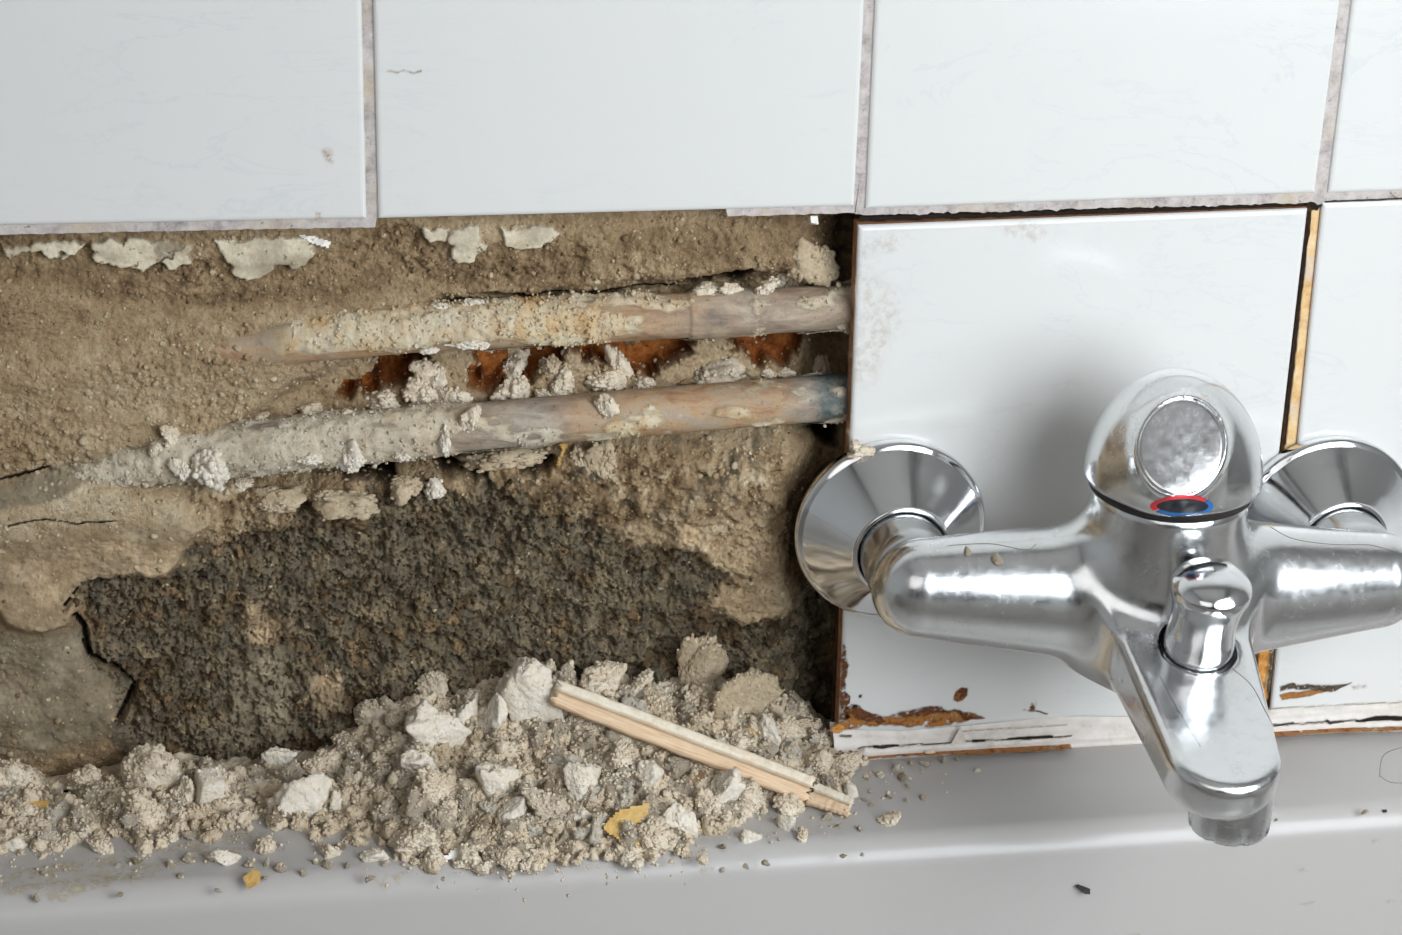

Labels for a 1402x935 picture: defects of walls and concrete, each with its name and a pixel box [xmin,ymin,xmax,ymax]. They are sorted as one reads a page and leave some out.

corrosion [337,353,428,396]
corrosion [467,338,690,390]
corrosion [730,332,801,365]
spalling [0,209,858,752]
water stain [697,452,739,486]
water stain [0,465,833,761]
crack [63,585,136,721]
spalling [0,588,235,794]
corrosion [1255,649,1350,700]